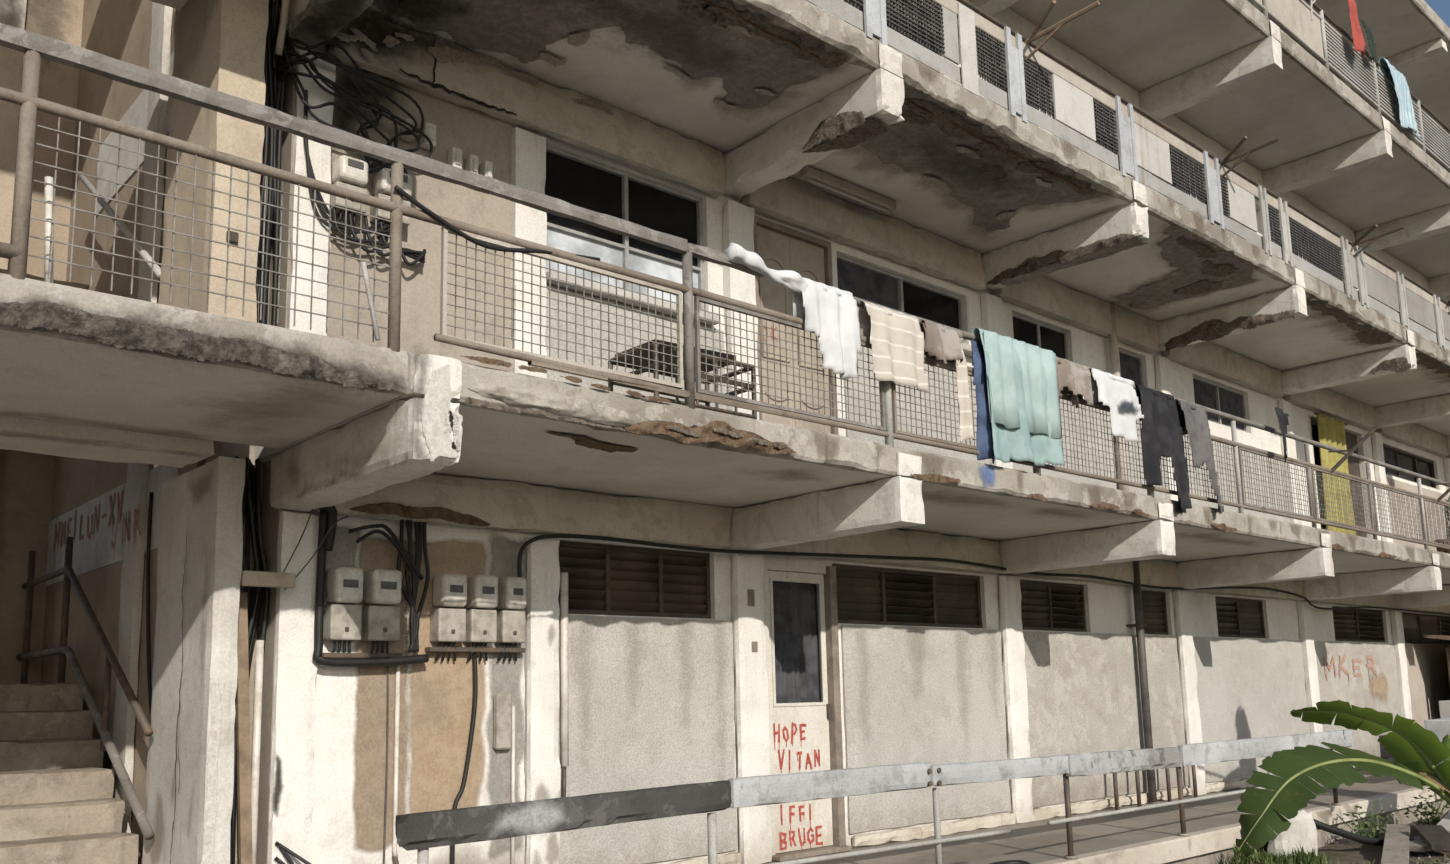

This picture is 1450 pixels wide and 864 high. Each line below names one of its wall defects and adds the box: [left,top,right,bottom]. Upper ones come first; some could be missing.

spalling [292,0,848,110]
spalling [798,89,1110,232]
spalling [986,225,1254,309]
spalling [0,300,399,391]
spalling [1165,293,1450,378]
peeling [416,360,463,461]
spalling [546,420,797,454]
flaking render [324,527,360,606]
flaking render [491,537,526,579]
flaking render [487,642,526,805]
flaking render [490,836,522,857]